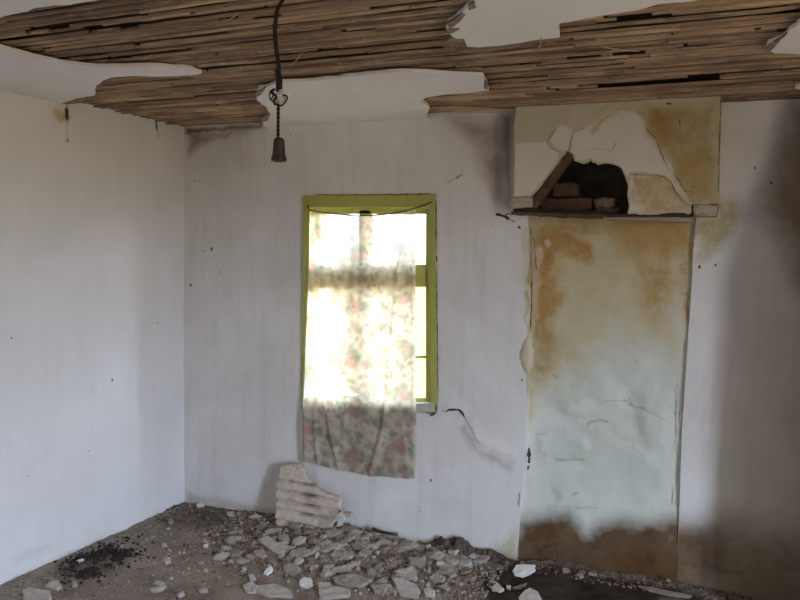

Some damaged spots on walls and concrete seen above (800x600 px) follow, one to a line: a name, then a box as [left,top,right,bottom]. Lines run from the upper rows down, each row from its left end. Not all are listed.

flaking render [446,0,476,48]
flaking render [470,43,520,51]
flaking render [63,80,105,104]
leakage [489,107,518,219]
crack [645,126,696,207]
leakage [529,91,744,439]